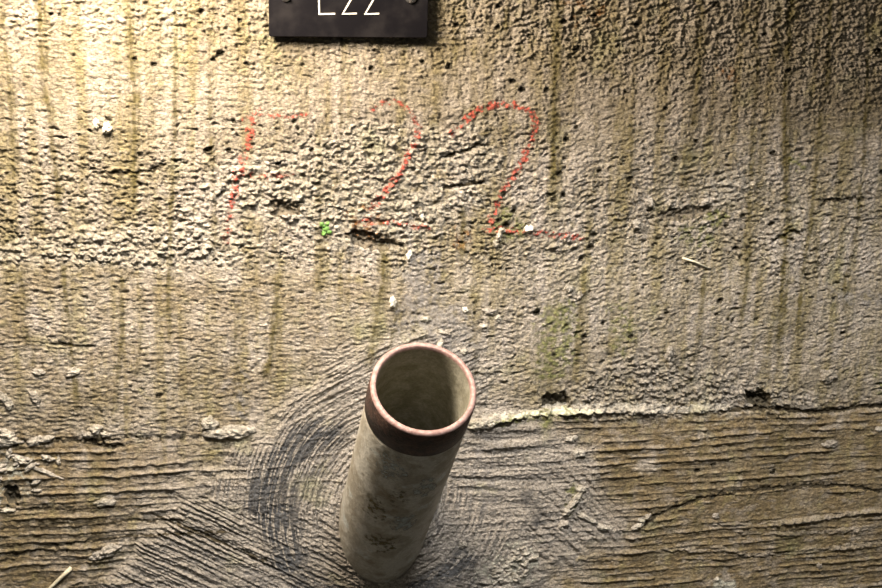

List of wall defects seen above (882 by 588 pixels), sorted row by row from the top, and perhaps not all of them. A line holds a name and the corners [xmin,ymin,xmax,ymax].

spalling [0,428,64,513]
crack [644,483,882,526]
crack [713,551,794,561]